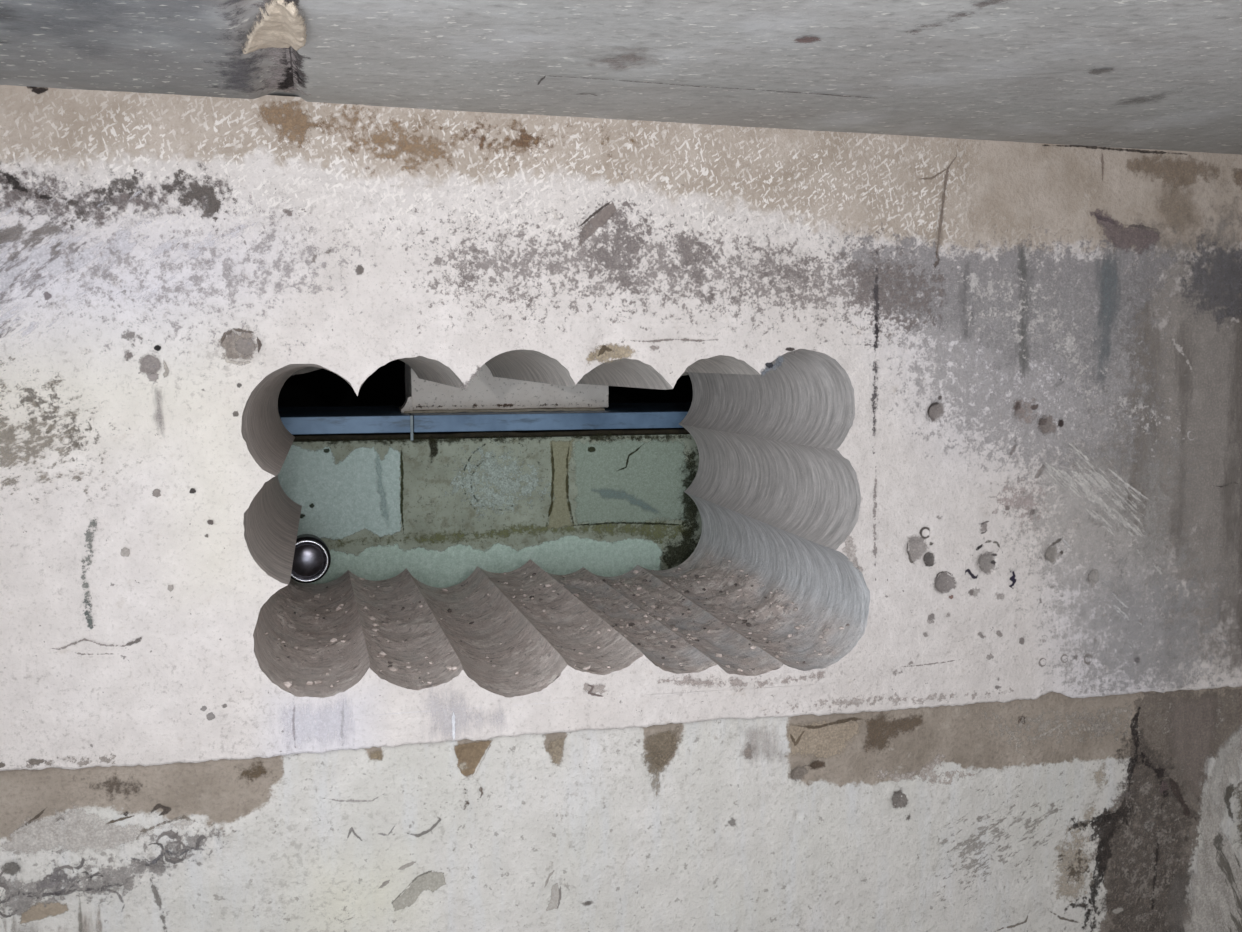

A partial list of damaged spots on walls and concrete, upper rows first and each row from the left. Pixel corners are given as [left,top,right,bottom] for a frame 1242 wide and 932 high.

rust [260,101,545,172]
leakage [0,165,376,353]
leakage [0,376,104,503]
leakage [829,156,1242,932]
spalling [454,740,492,809]
spalling [546,739,564,764]
spalling [788,693,954,781]
crack [0,816,203,930]
peeling [379,862,446,911]